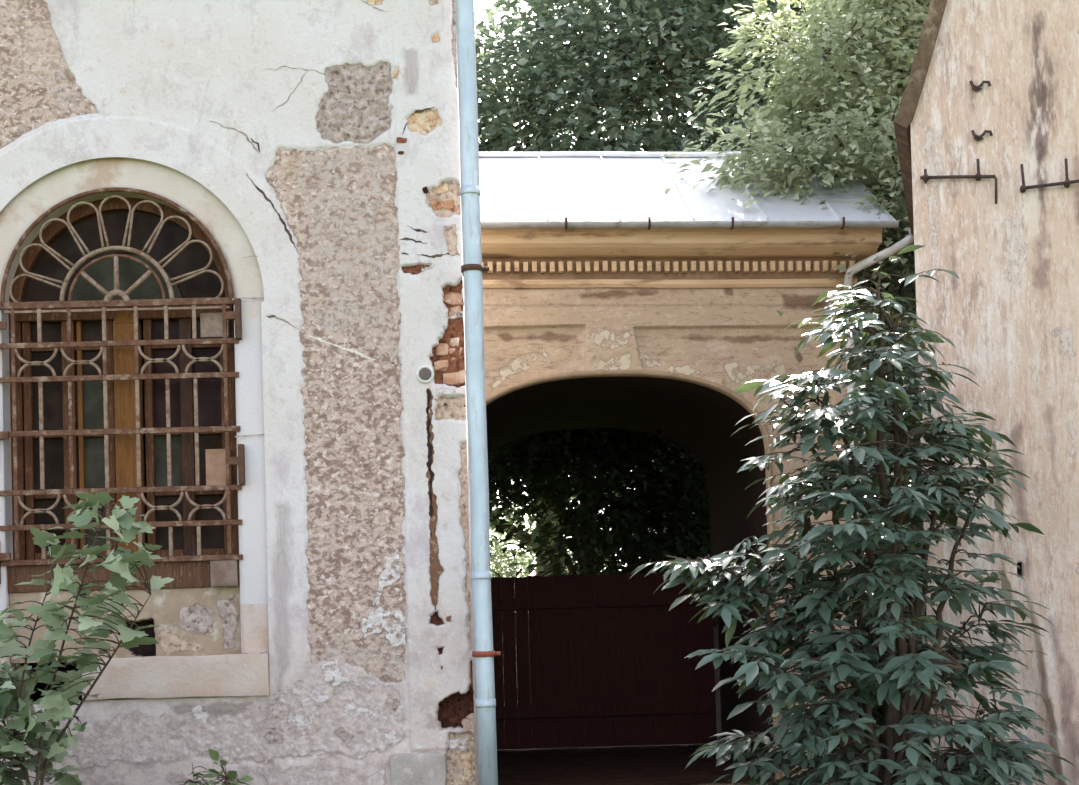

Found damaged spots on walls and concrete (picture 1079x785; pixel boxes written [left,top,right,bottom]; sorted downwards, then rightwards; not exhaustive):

crack [271,66,325,108]
spalling [316,62,442,154]
crack [210,121,297,249]
flaking render [422,181,461,256]
flaking render [430,280,467,420]
crack [426,388,444,610]